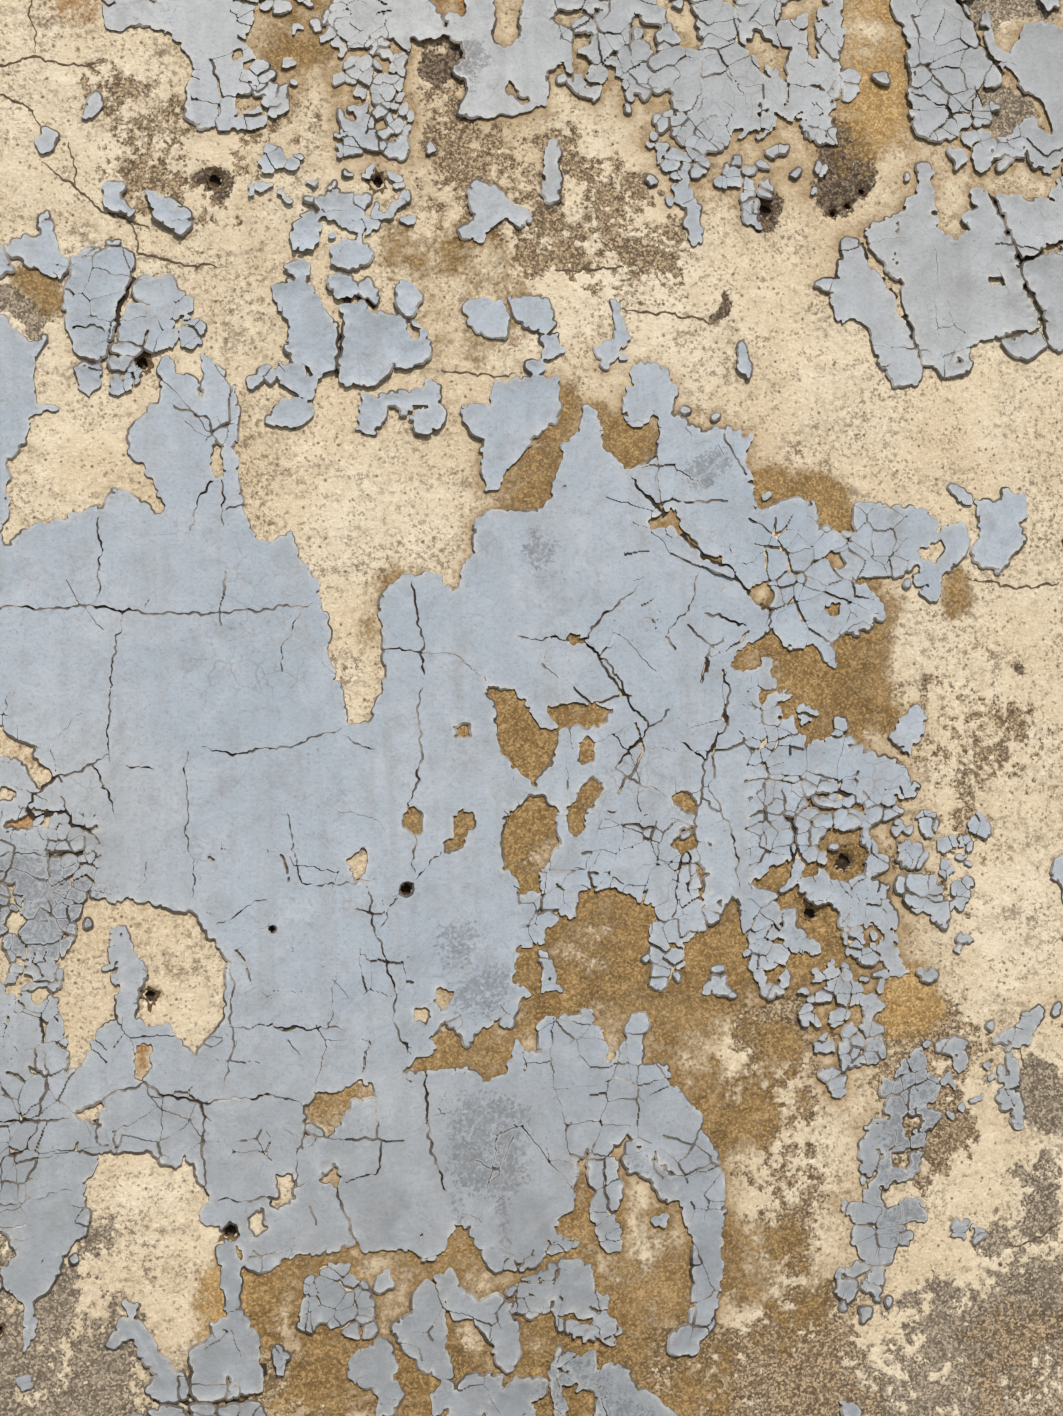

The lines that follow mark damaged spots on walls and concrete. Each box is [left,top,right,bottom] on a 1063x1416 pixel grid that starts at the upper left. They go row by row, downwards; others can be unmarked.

peeling [506,81,529,104]
peeling [988,277,1005,286]
crack [988,193,1063,321]
peeling [648,465,734,578]
crack [632,478,772,626]
crack [94,535,270,802]
crack [539,611,665,796]
crack [684,657,729,762]
crack [26,775,97,858]
peeling [414,987,454,1022]
peeling [702,964,738,999]
peeling [301,1079,380,1148]